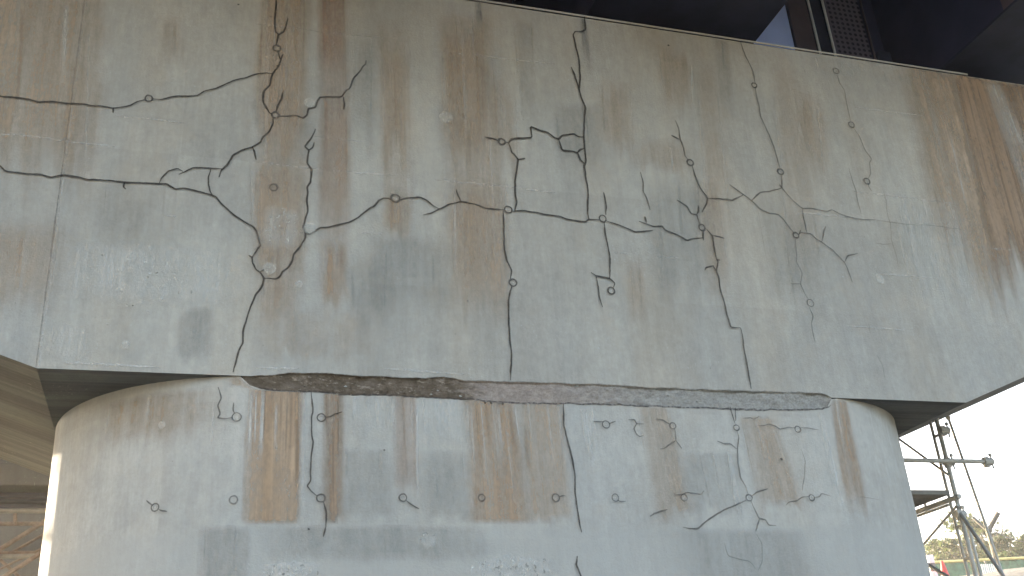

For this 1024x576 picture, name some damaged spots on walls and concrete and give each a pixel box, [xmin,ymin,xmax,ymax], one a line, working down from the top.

crack [0,0,872,422]
rust [912,69,1024,280]
rust [249,390,301,522]
crack [307,392,341,537]
spalling [243,373,831,411]
crack [552,404,582,576]
crack [651,407,773,530]